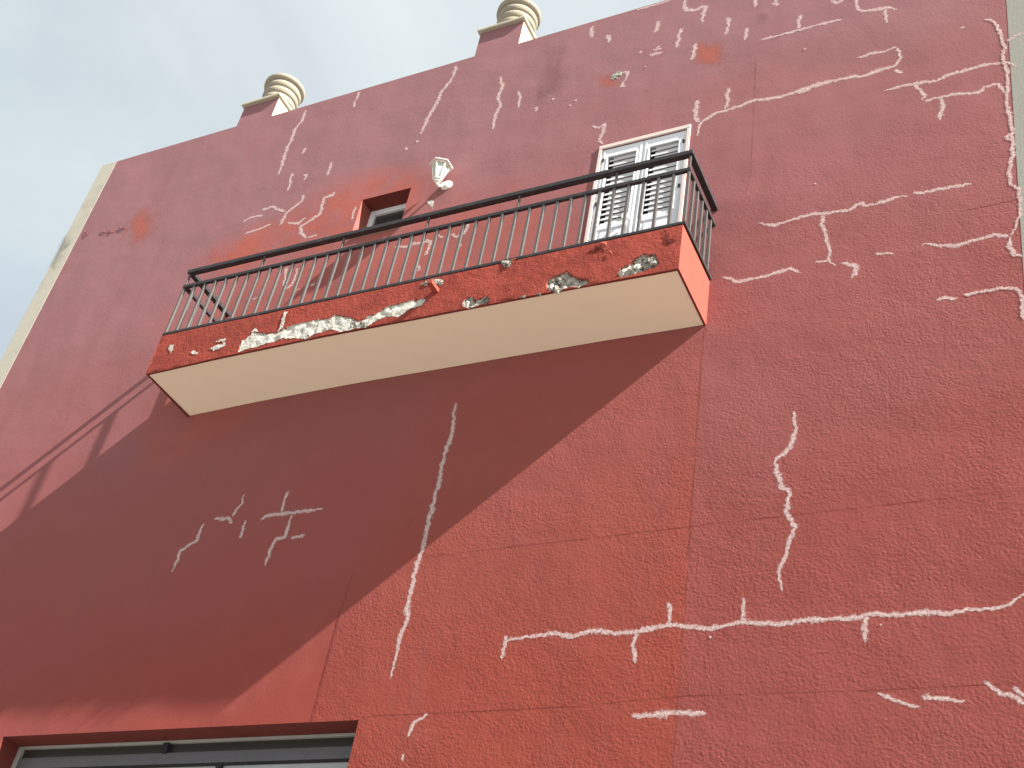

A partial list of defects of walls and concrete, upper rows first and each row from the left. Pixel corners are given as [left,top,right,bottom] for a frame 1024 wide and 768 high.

crack [637,0,1023,257]
crack [244,110,356,238]
spalling [238,278,443,352]
spalling [463,296,489,309]
spalling [519,272,588,299]
spalling [618,254,658,277]
crack [724,183,971,283]
crack [171,491,323,572]
crack [390,403,457,676]
crack [773,411,798,591]
crack [500,593,1024,663]
crack [633,708,706,719]